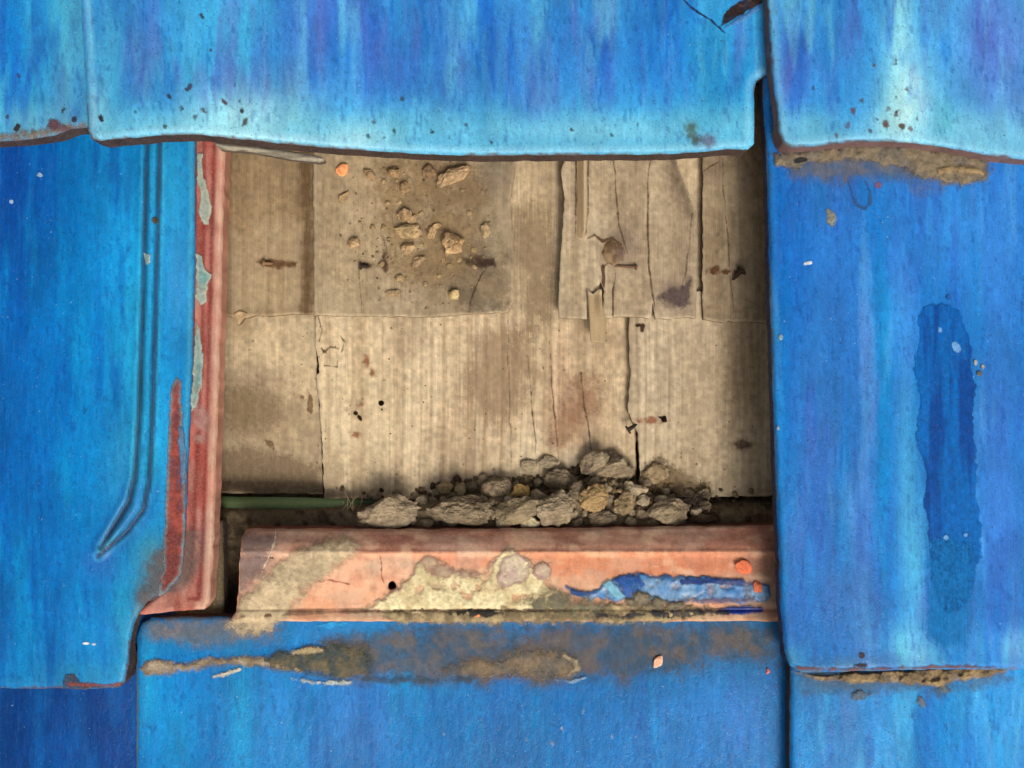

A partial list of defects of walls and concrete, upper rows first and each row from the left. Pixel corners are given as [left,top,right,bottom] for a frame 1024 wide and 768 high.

peeling [195,253,212,305]
damp [658,279,692,307]
peeling [190,322,204,411]
damp [914,294,982,647]
peeling [735,560,763,593]